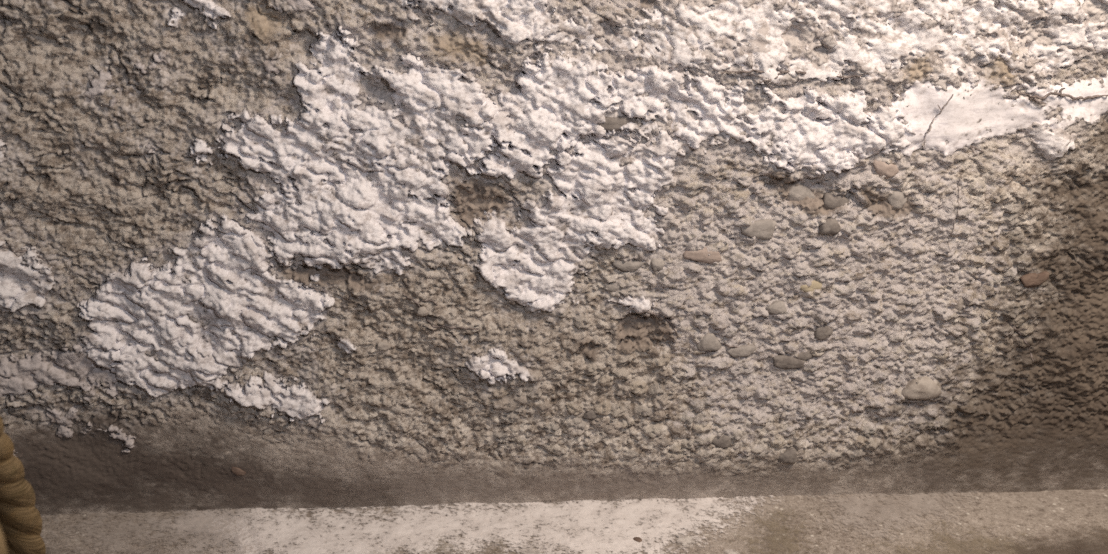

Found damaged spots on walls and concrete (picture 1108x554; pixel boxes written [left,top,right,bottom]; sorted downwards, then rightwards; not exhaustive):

leakage [154,0,186,34]
leakage [182,0,232,62]
leakage [227,0,325,34]
leakage [0,89,36,188]
leakage [59,43,186,177]
crack [924,94,954,147]
crack [1017,88,1108,104]
leakage [0,231,77,319]
leakage [601,276,656,325]
leakage [929,165,1108,489]
leakage [438,336,543,397]
leakage [1020,528,1108,554]